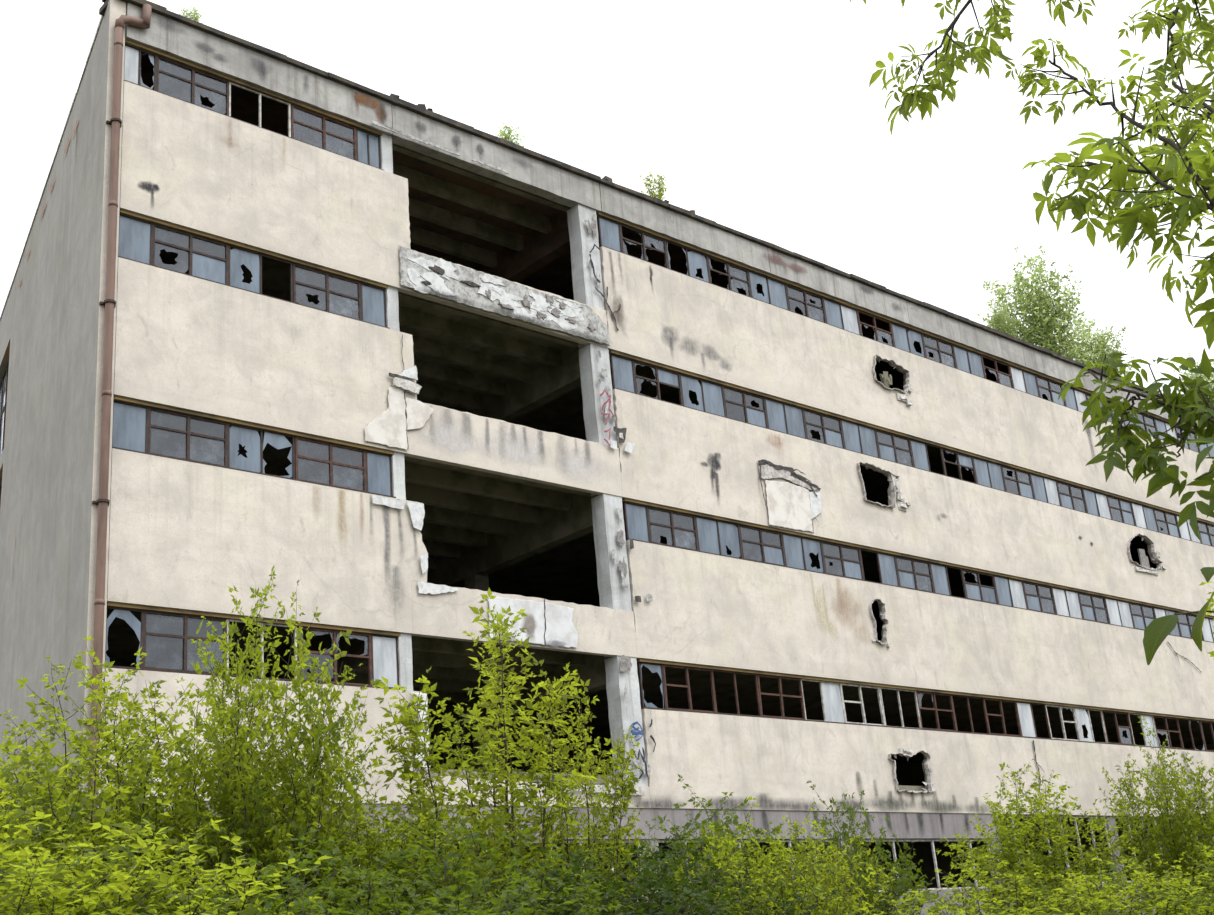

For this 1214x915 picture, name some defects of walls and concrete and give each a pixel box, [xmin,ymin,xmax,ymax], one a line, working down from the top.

peeling [399,246,635,454]
peeling [389,365,434,430]
spalling [872,354,913,407]
spalling [372,495,425,531]
spalling [758,459,822,519]
spalling [857,461,911,512]
peeling [418,553,459,595]
spalling [1127,533,1166,576]
spalling [869,597,891,647]
spalling [888,748,935,793]